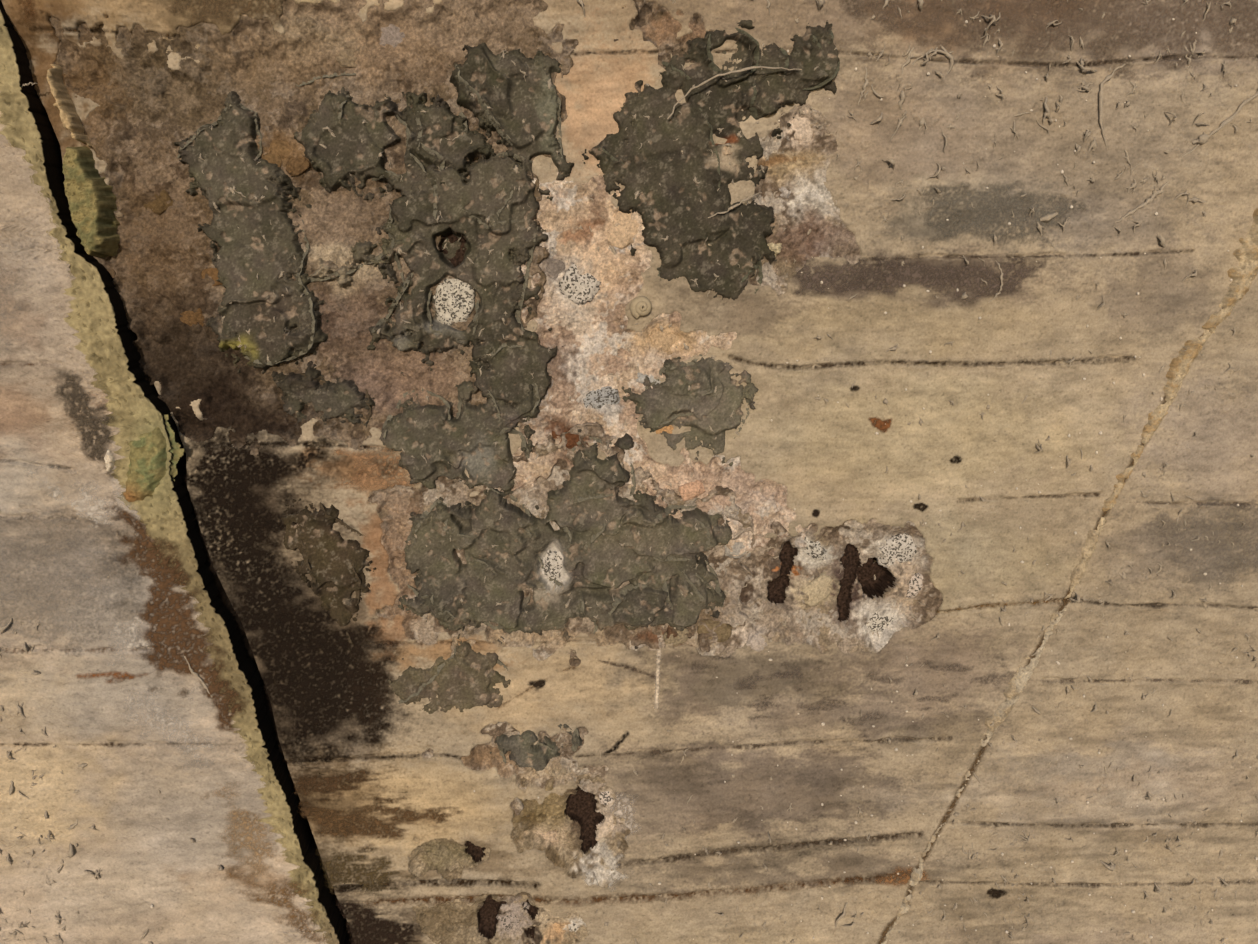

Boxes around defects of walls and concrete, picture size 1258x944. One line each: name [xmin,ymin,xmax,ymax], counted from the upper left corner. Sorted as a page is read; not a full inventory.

spalling [622,0,729,77]
spalling [49,0,579,456]
spalling [749,59,861,295]
leakage [794,258,1043,298]
leakage [49,487,242,731]
leakage [181,421,460,944]
peeling [319,502,366,537]
spalling [368,154,943,666]
crack [312,208,1258,944]
spalling [409,837,490,882]
spalling [412,892,592,944]
spalling [460,721,631,888]